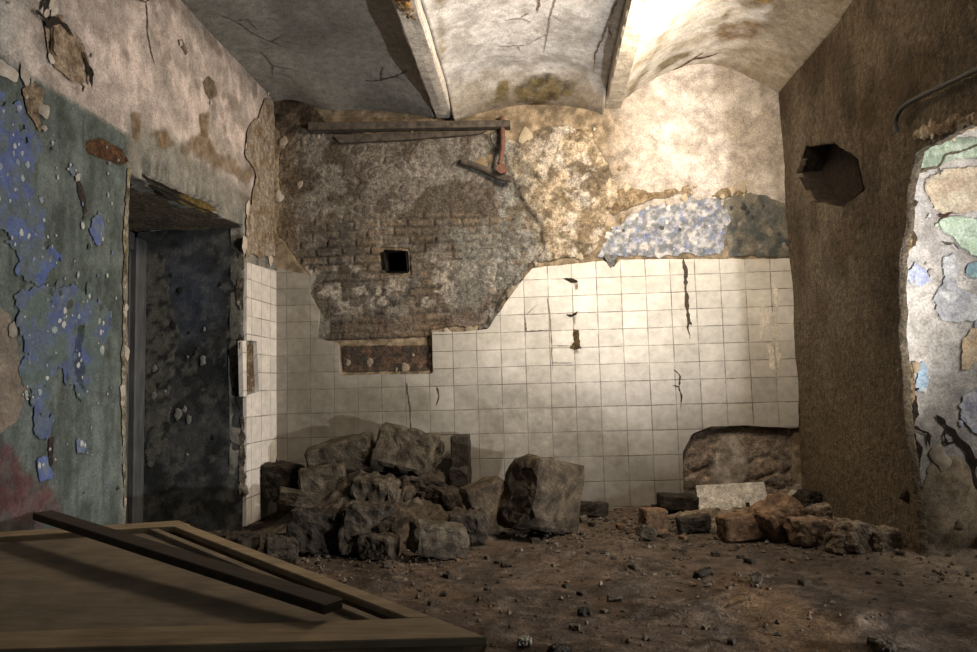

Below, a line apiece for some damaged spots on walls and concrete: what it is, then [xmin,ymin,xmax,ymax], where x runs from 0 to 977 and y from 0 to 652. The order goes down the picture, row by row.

flaking render [45,0,95,92]
crack [138,0,155,64]
crack [220,15,293,76]
flaking render [395,0,418,21]
spalling [797,144,865,209]
peeling [0,59,131,506]
flaking render [232,93,803,495]
crack [682,259,692,339]
flaking render [907,112,977,370]
peeling [144,250,206,467]